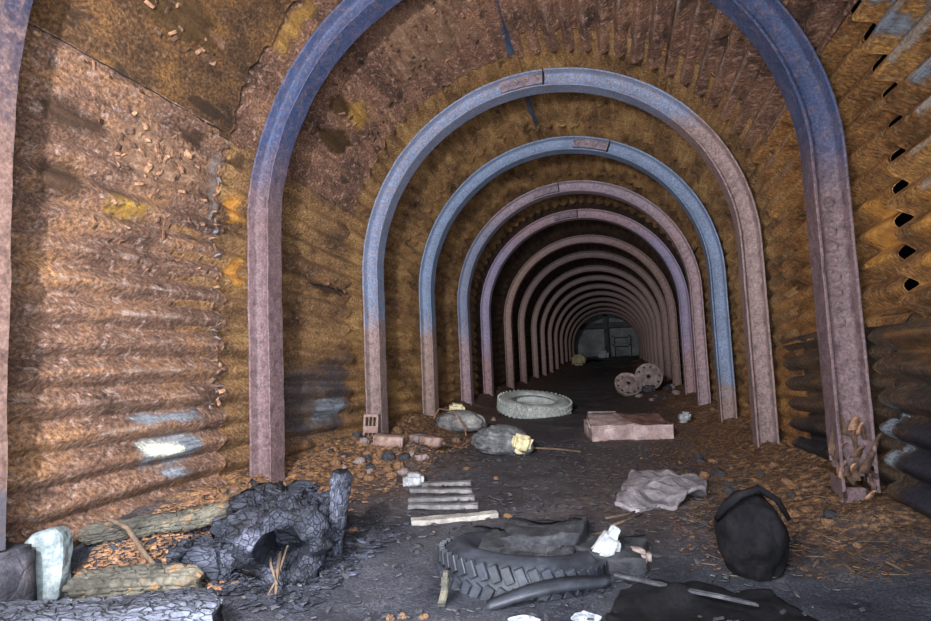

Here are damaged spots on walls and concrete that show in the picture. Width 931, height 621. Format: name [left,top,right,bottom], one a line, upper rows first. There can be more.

efflorescence [129,411,200,425]
efflorescence [136,434,202,478]
rust [829,414,883,500]